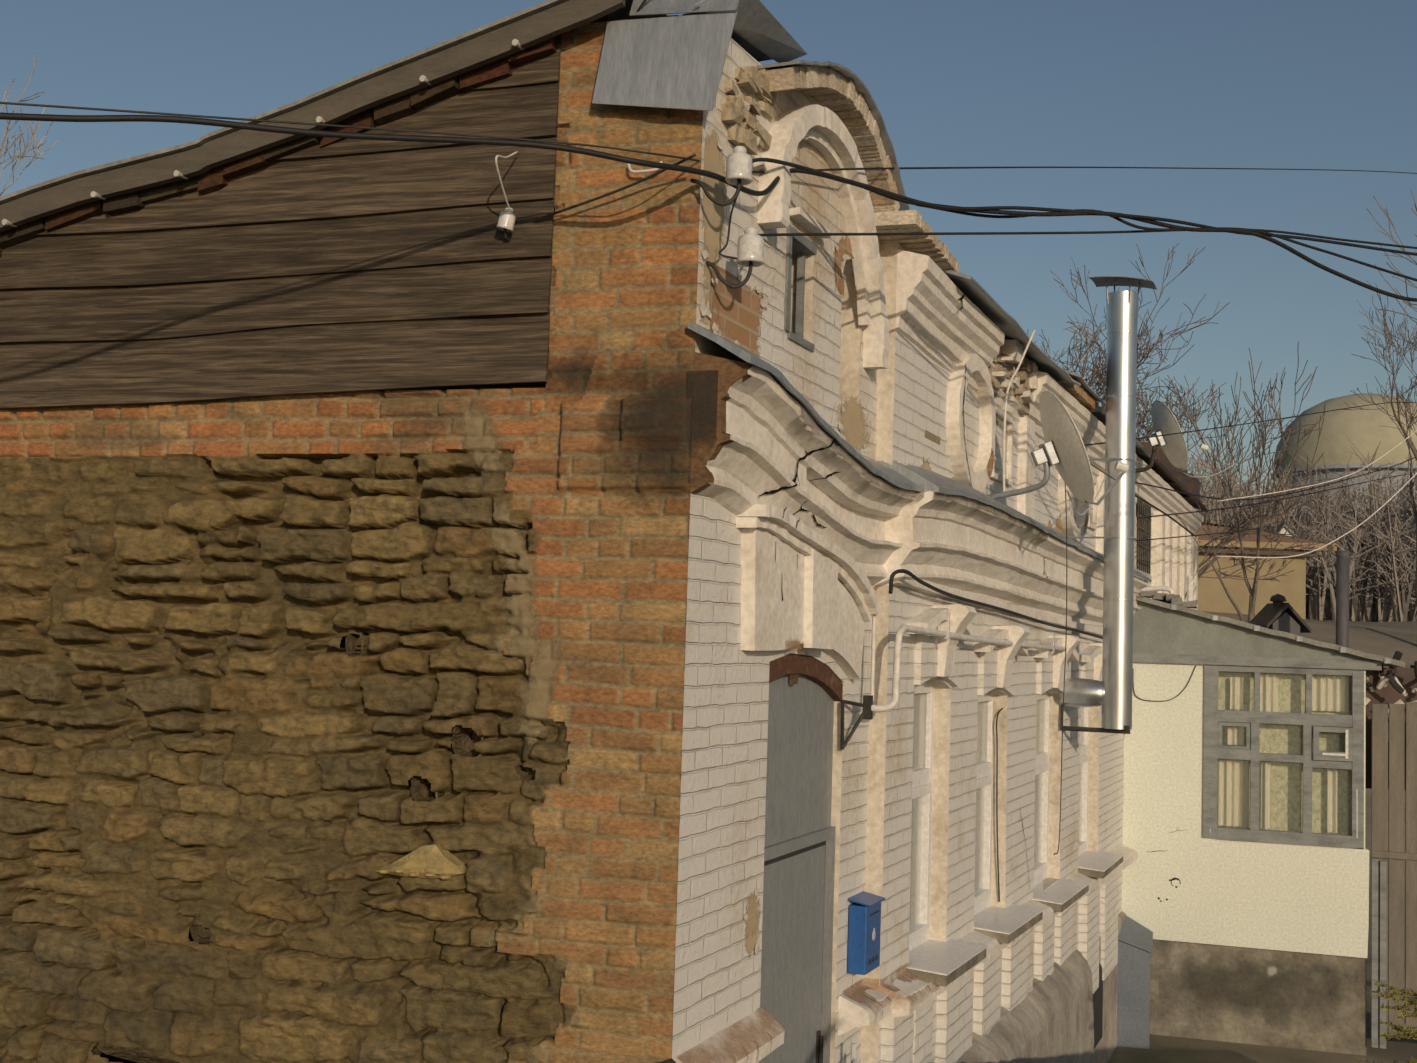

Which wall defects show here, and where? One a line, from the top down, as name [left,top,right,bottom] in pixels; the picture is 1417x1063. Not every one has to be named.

spalling [700,66,778,357]
peeling [834,236,857,299]
water stain [612,370,718,490]
peeling [837,392,869,453]
crack [759,439,840,601]